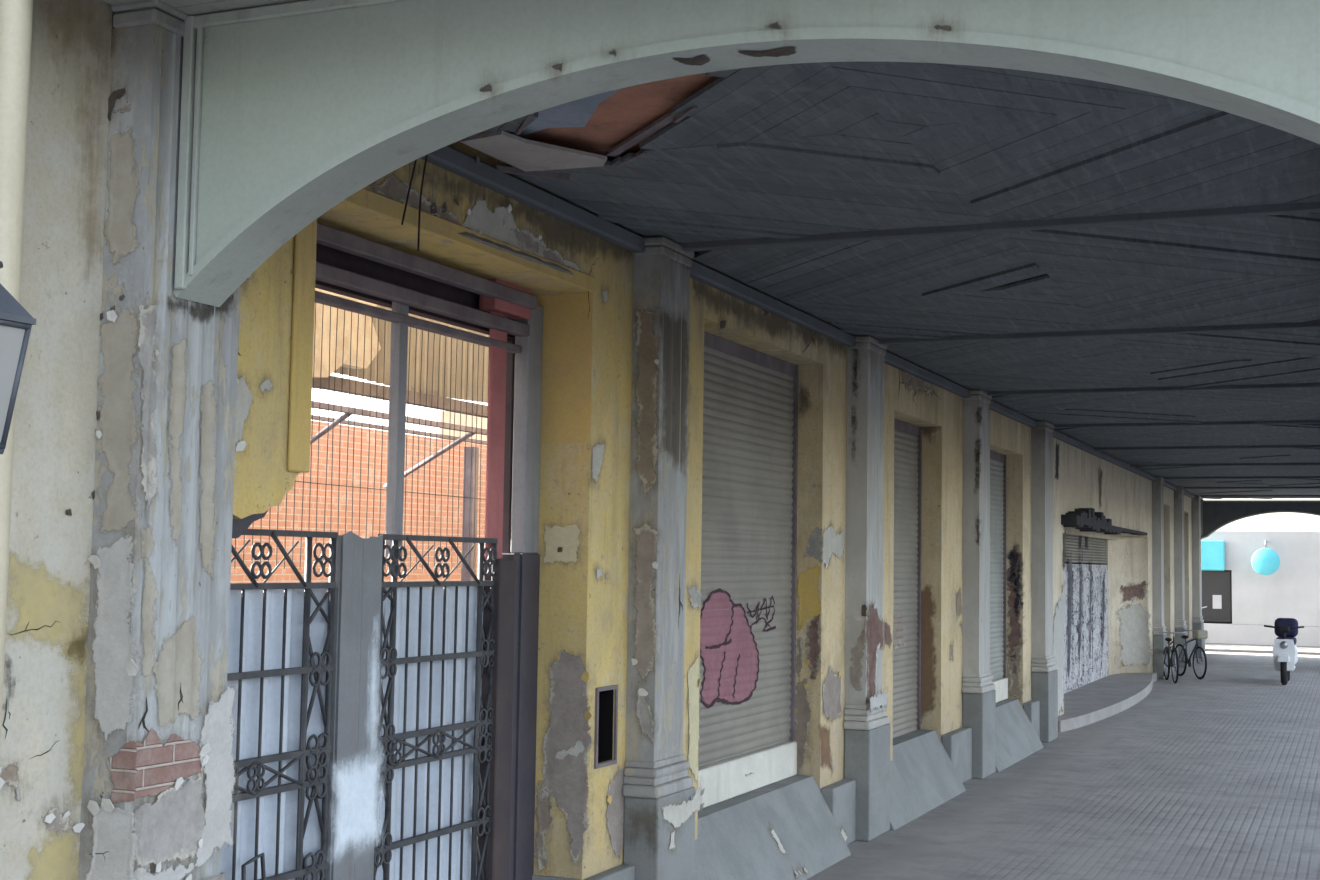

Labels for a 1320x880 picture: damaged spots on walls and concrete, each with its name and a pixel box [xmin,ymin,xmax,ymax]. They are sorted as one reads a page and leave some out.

flaking render [371,172,580,271]
peeling [235,375,273,452]
peeling [8,304,235,880]
peeling [631,523,659,743]
peeling [795,526,892,771]
water stain [1007,550,1023,616]
peeling [534,651,592,874]
peeling [606,768,625,859]
peeling [662,656,705,849]